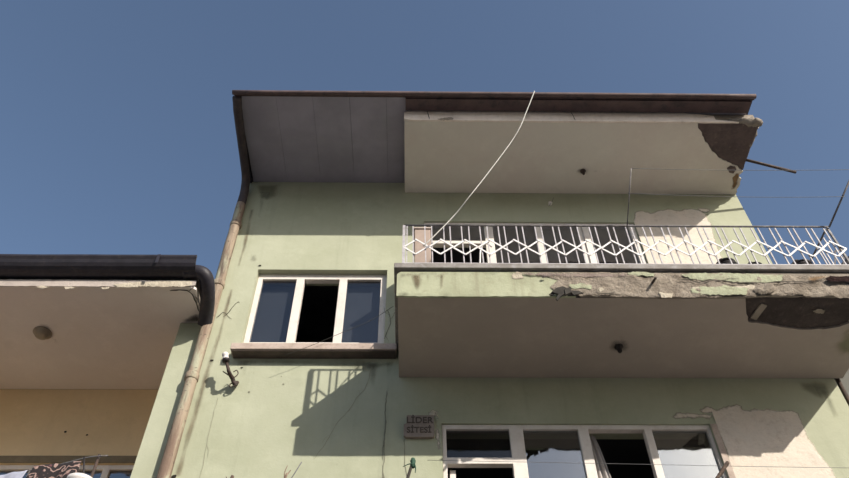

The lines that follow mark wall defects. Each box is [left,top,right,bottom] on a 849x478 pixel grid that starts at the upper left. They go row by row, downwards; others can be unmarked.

spalling [698,116,763,173]
flaking render [512,208,849,328]
crack [382,394,407,478]
flaking render [673,405,836,478]